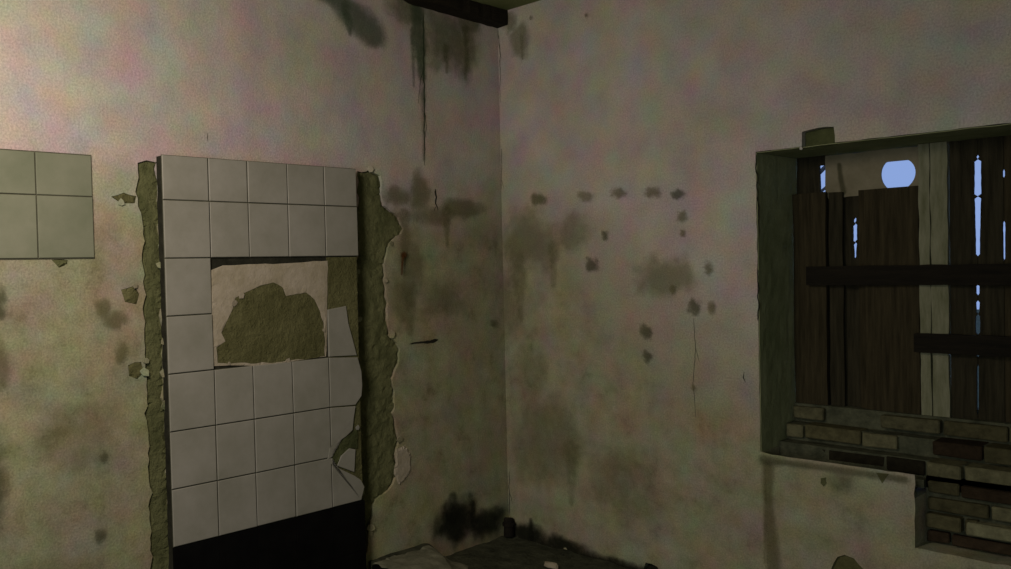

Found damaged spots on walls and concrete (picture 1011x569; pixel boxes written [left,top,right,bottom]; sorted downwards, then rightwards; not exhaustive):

damp [327,0,382,45]
damp [401,1,425,79]
spalling [111,161,169,569]
spalling [216,166,411,546]
damp [434,494,504,543]
damp [514,520,645,569]
spalling [833,555,863,569]